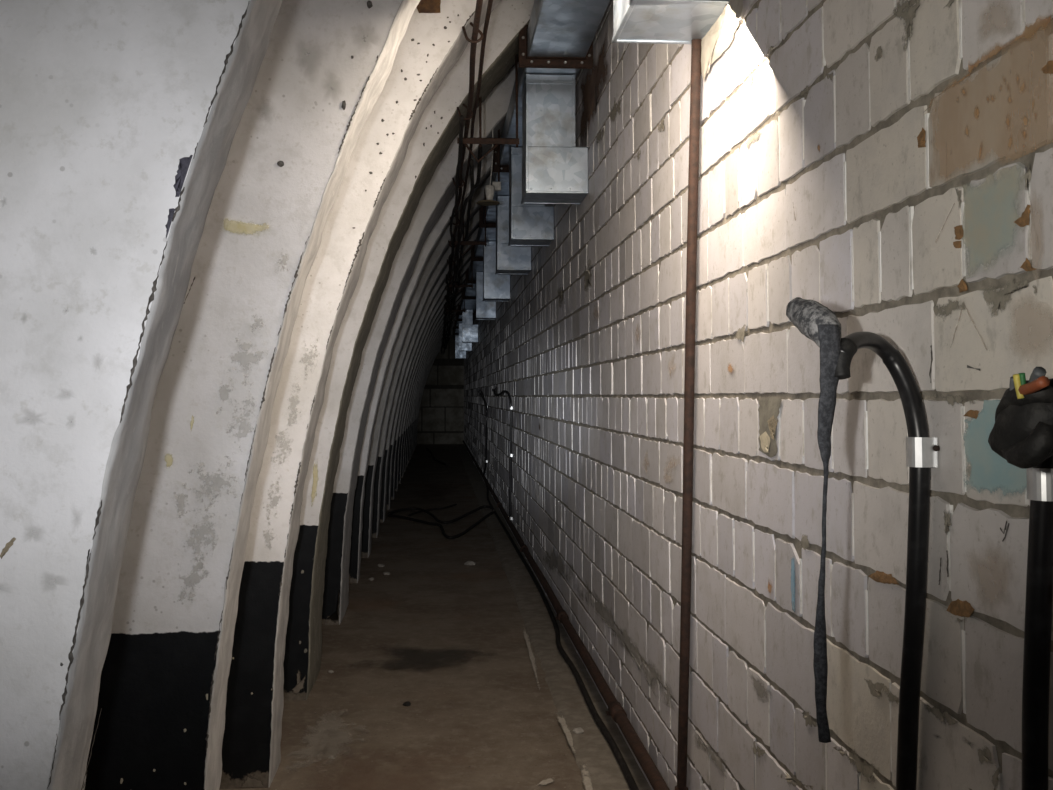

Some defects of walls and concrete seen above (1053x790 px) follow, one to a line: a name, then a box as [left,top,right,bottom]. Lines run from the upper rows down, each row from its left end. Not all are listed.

peeling [1041,60,1053,74]
peeling [917,128,926,148]
peeling [165,155,193,238]
peeling [1014,204,1031,227]
peeling [953,225,963,248]
spalling [758,397,782,458]
peeling [868,571,900,585]
peeling [946,599,975,617]
water stain [384,648,475,669]